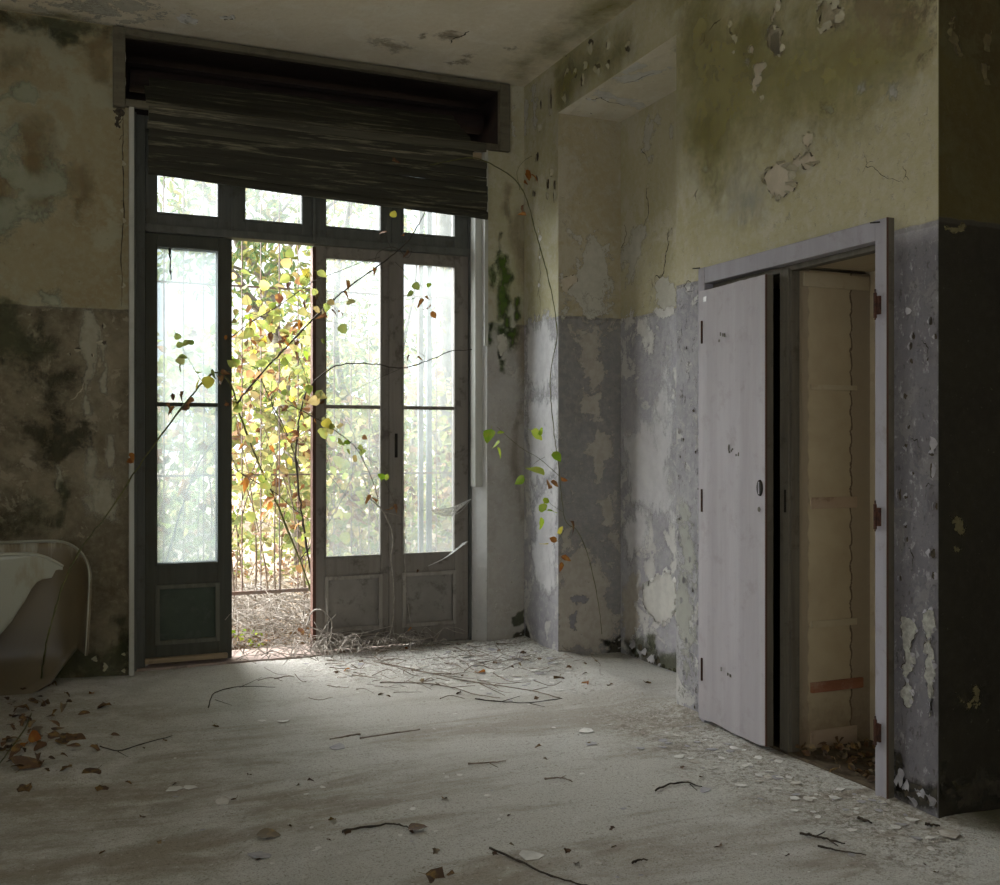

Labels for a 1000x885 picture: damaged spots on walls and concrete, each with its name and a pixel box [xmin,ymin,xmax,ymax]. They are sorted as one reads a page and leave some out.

peeling [744,0,785,102]
peeling [815,0,846,34]
peeling [761,131,820,202]
crack [621,183,691,292]
damp [488,297,521,371]
damp [0,300,118,532]
peeling [424,221,694,690]
peeling [898,607,937,717]